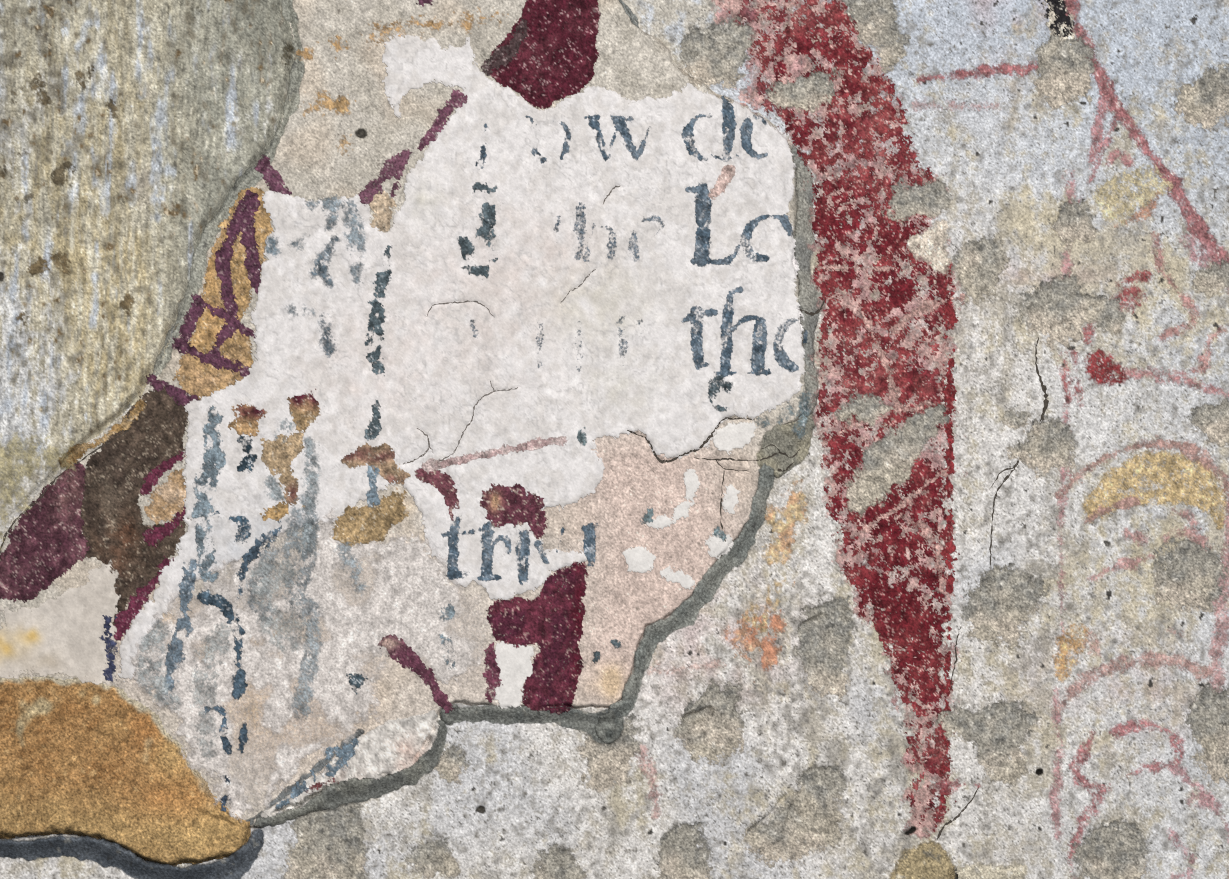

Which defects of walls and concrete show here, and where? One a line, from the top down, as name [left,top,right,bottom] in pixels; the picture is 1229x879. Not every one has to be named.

damp [11,73,51,106]
damp [75,65,95,88]
damp [51,161,76,186]
damp [28,252,71,276]
damp [120,293,134,315]
crack [989,337,1049,570]
spalling [332,443,460,547]
spalling [480,483,548,539]
peeling [494,641,534,709]
flaking render [792,593,858,702]
flaking render [674,680,744,767]
flaking render [283,785,369,879]